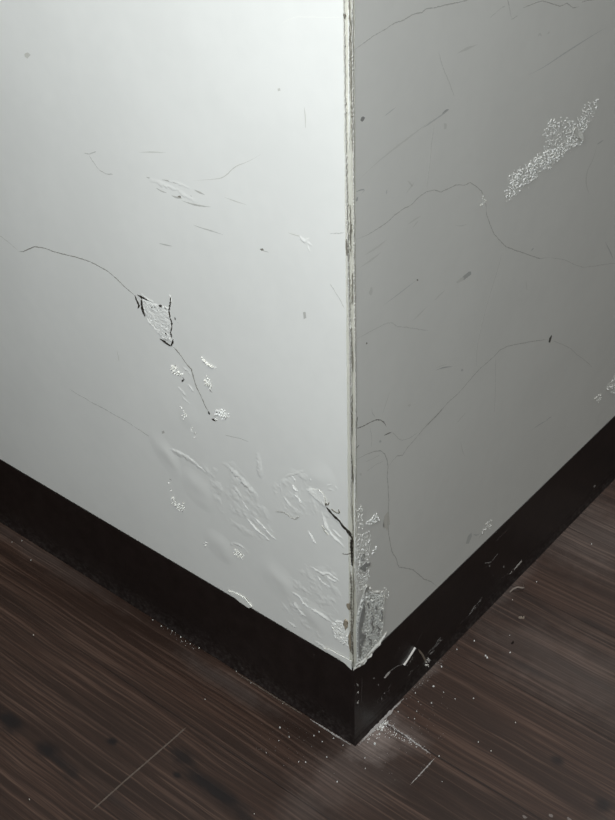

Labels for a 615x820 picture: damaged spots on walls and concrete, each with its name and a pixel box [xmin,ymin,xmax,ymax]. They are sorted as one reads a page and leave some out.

spalling [504,99,599,200]
crack [0,236,148,316]
peeling [141,293,176,342]
crack [160,298,207,409]
crack [322,0,545,663]
spalling [331,504,389,671]